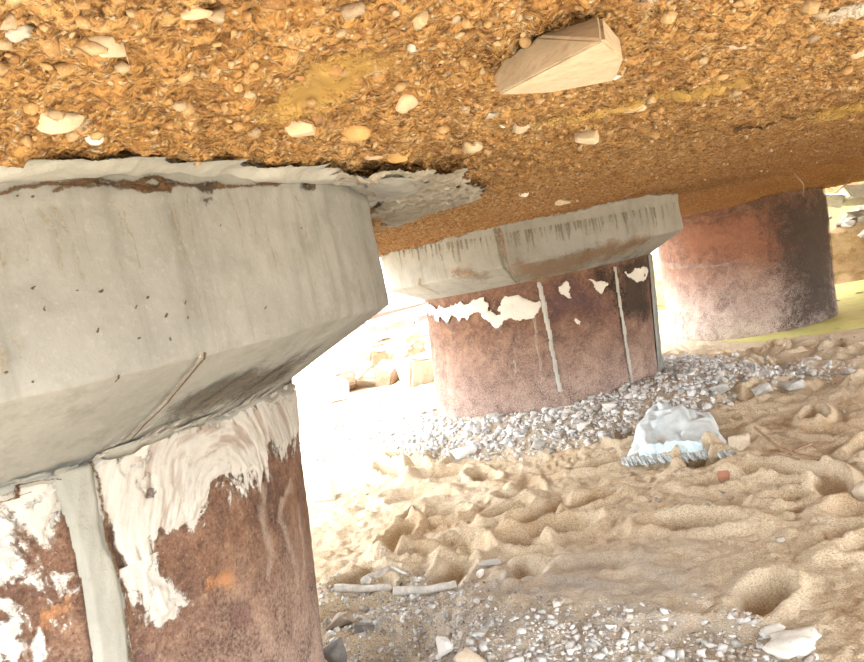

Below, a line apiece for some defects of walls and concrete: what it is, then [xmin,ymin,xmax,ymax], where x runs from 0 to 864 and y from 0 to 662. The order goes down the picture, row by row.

spalling [333,166,487,229]
peeling [425,295,541,328]
peeling [559,281,571,298]
peeling [589,279,608,294]
peeling [624,267,648,283]
damp [162,348,318,425]
peeling [79,376,300,628]
peeling [0,479,79,604]
peeling [0,597,50,662]